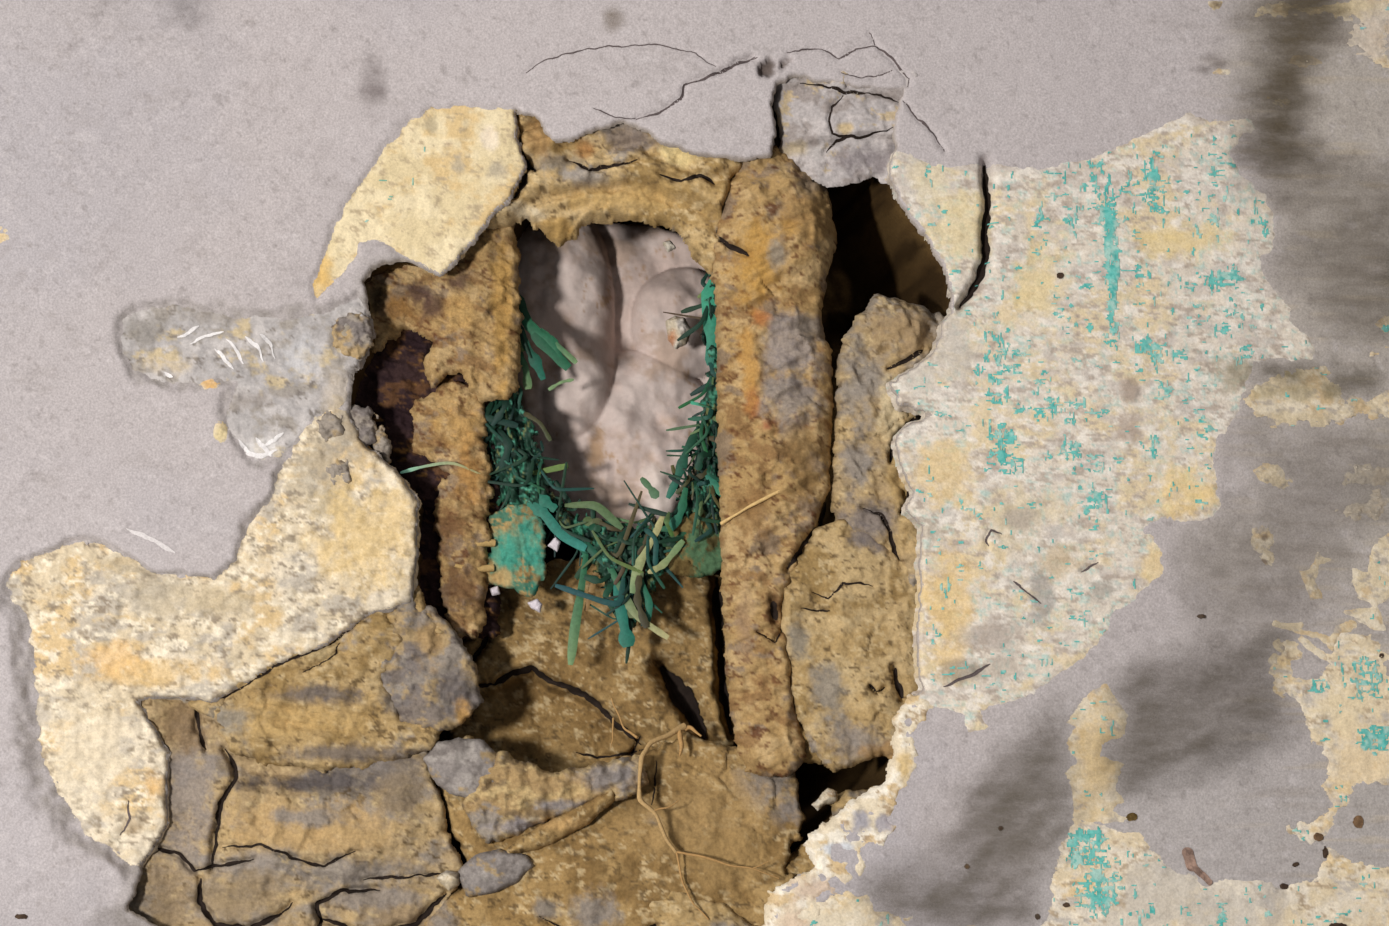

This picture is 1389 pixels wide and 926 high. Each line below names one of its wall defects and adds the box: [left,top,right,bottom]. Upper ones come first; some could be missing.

crack [526,33,944,153]
leakage [1255,0,1332,164]
peeling [1254,0,1389,68]
spalling [514,219,531,241]
crack [569,159,715,185]
crack [959,166,991,308]
peeling [6,106,527,868]
spalling [543,512,580,564]
peeling [762,69,1389,926]
crack [158,622,466,926]
crack [463,636,657,805]
leakage [929,755,1053,905]